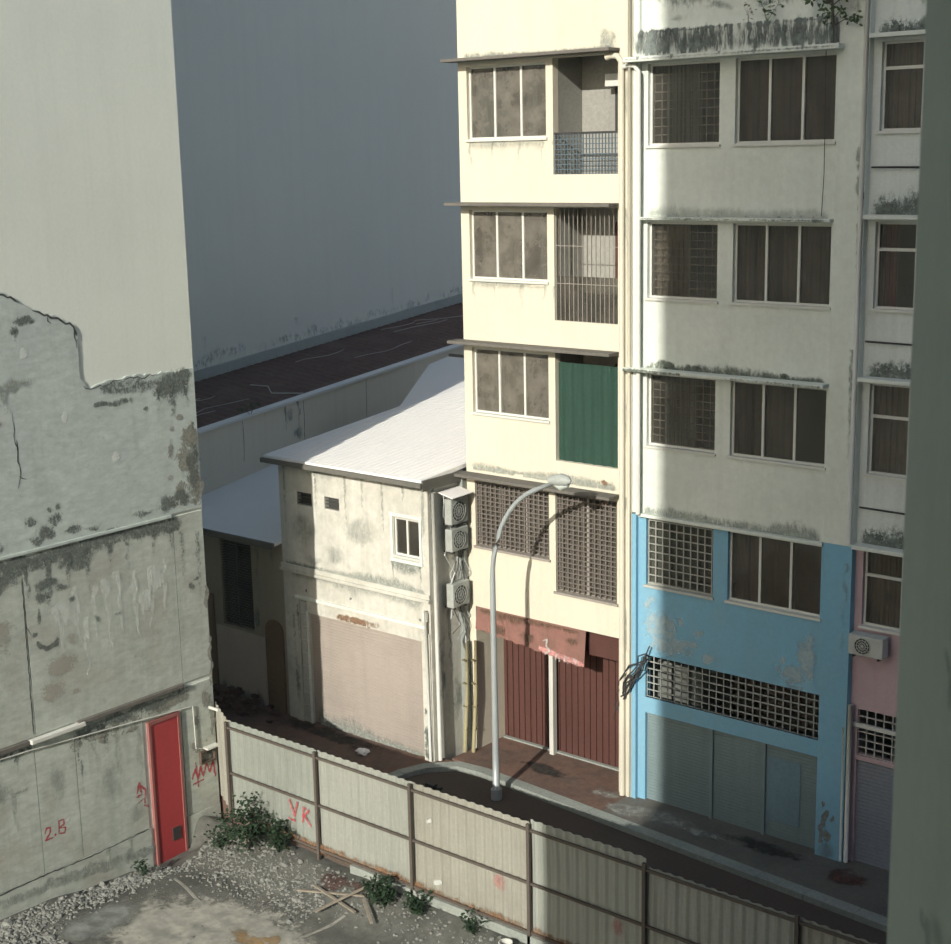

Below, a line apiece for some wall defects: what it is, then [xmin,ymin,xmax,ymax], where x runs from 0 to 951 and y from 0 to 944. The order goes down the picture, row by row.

water stain [634,16,833,58]
water stain [879,17,926,33]
crack [12,415,24,489]
flaking render [0,292,205,557]
water stain [0,445,199,604]
rust [337,614,372,627]